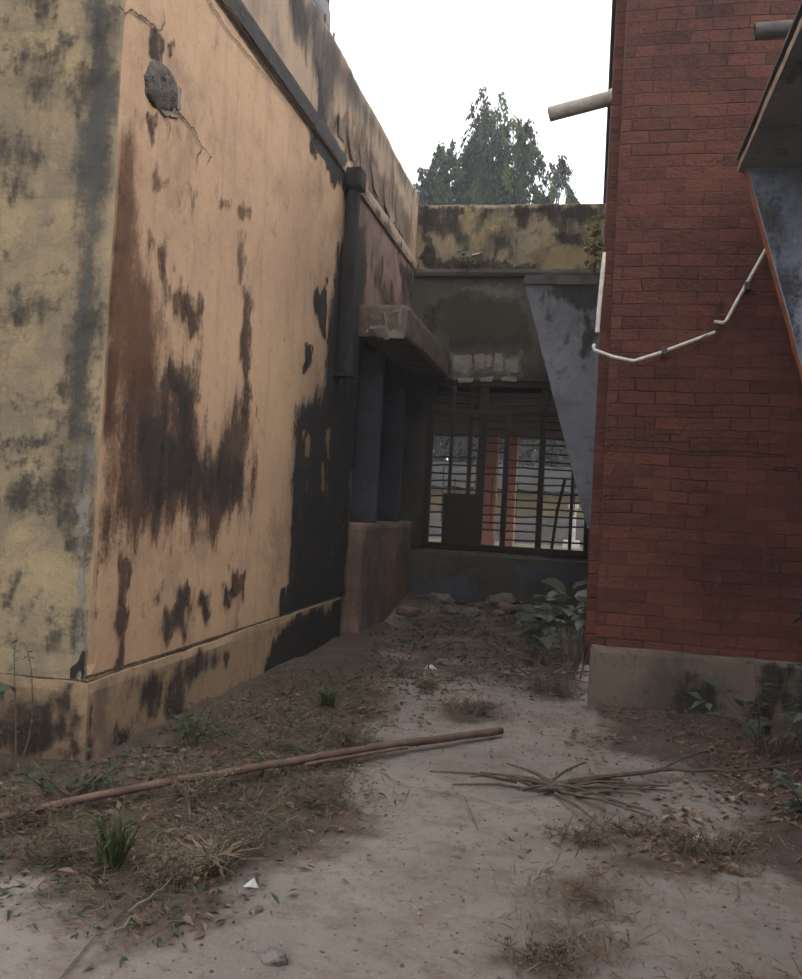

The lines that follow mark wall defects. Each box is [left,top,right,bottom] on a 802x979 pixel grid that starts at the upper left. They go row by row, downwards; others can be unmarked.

crack [118,5,165,32]
crack [165,110,212,172]
leakage [226,0,381,199]
crack [209,0,400,224]
leakage [363,161,605,307]
leakage [0,0,257,671]
leakage [264,222,367,673]
leakage [127,648,230,719]